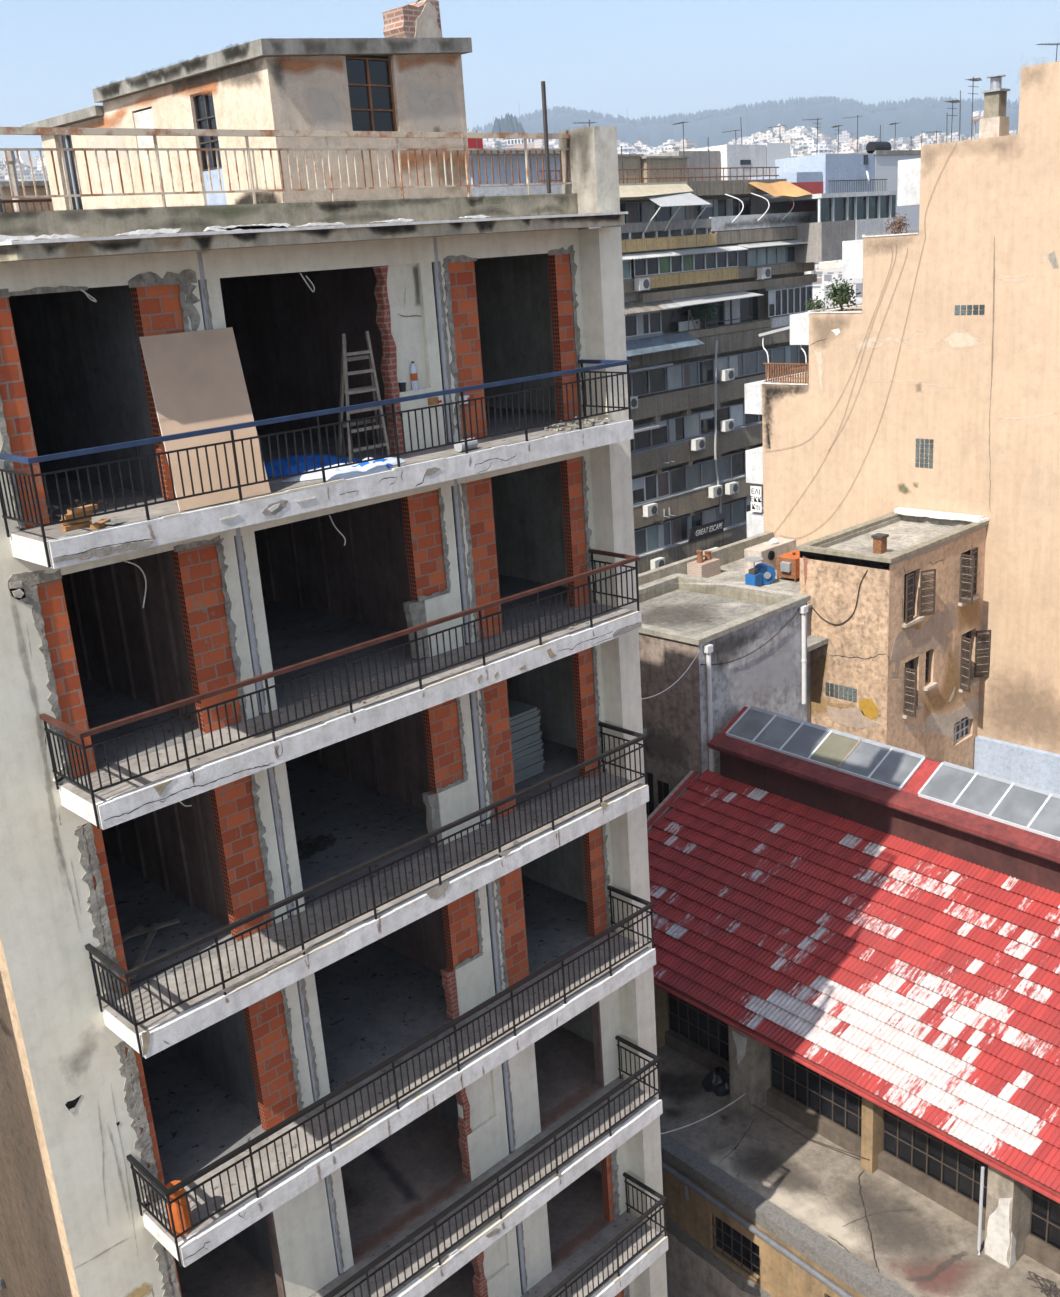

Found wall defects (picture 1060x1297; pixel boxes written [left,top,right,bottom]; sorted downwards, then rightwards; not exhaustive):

spalling [204,222,345,231]
spalling [115,228,181,236]
spalling [0,234,79,242]
flaking render [985,1198,1017,1268]